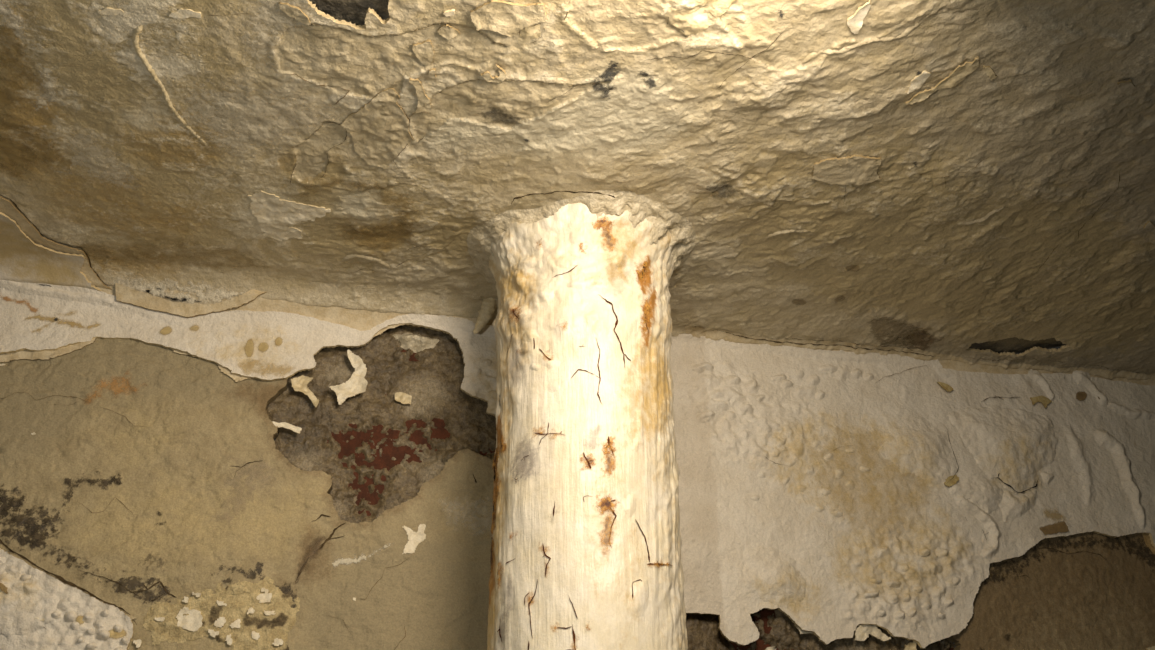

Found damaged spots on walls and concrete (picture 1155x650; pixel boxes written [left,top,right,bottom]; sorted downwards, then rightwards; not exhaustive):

peeling [169,8,201,19]
crack [644,30,785,88]
crack [288,74,350,182]
crack [1,195,108,286]
rust [592,218,615,251]
peeling [0,191,497,650]
rust [580,437,615,474]
leakage [0,471,121,577]
rust [598,496,617,553]
leakage [106,571,171,603]
leakage [219,562,265,585]
peeling [686,521,1155,650]